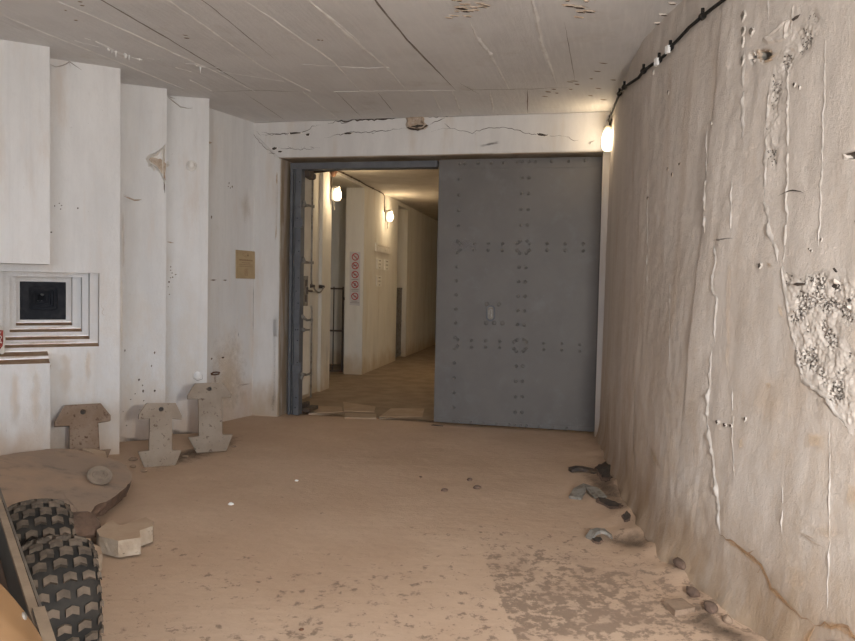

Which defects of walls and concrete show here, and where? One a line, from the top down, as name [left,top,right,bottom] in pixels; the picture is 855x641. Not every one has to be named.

spalling [741,0,816,69]
spalling [146,145,169,193]
crack [254,118,402,155]
spalling [842,151,855,162]
flaking render [781,263,853,429]
crack [721,535,855,641]